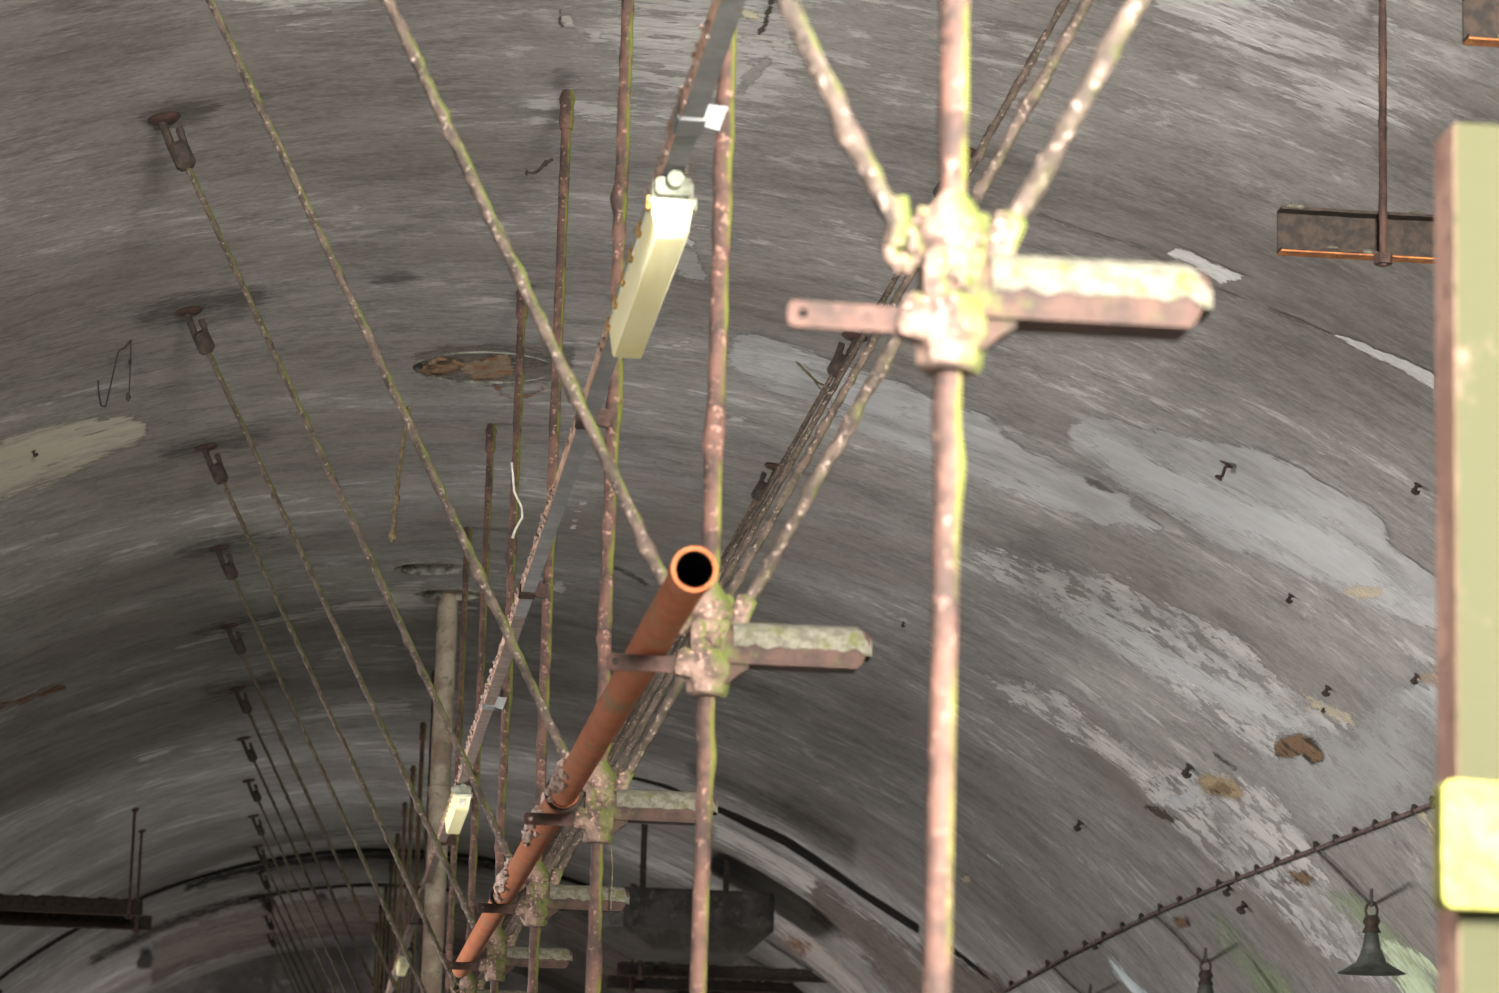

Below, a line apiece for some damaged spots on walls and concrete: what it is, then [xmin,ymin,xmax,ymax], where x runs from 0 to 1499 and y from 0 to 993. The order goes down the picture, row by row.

peeling [0,413,147,502]
peeling [727,334,934,462]
peeling [961,408,1436,631]
peeling [967,548,1355,767]
peeling [984,674,1390,987]